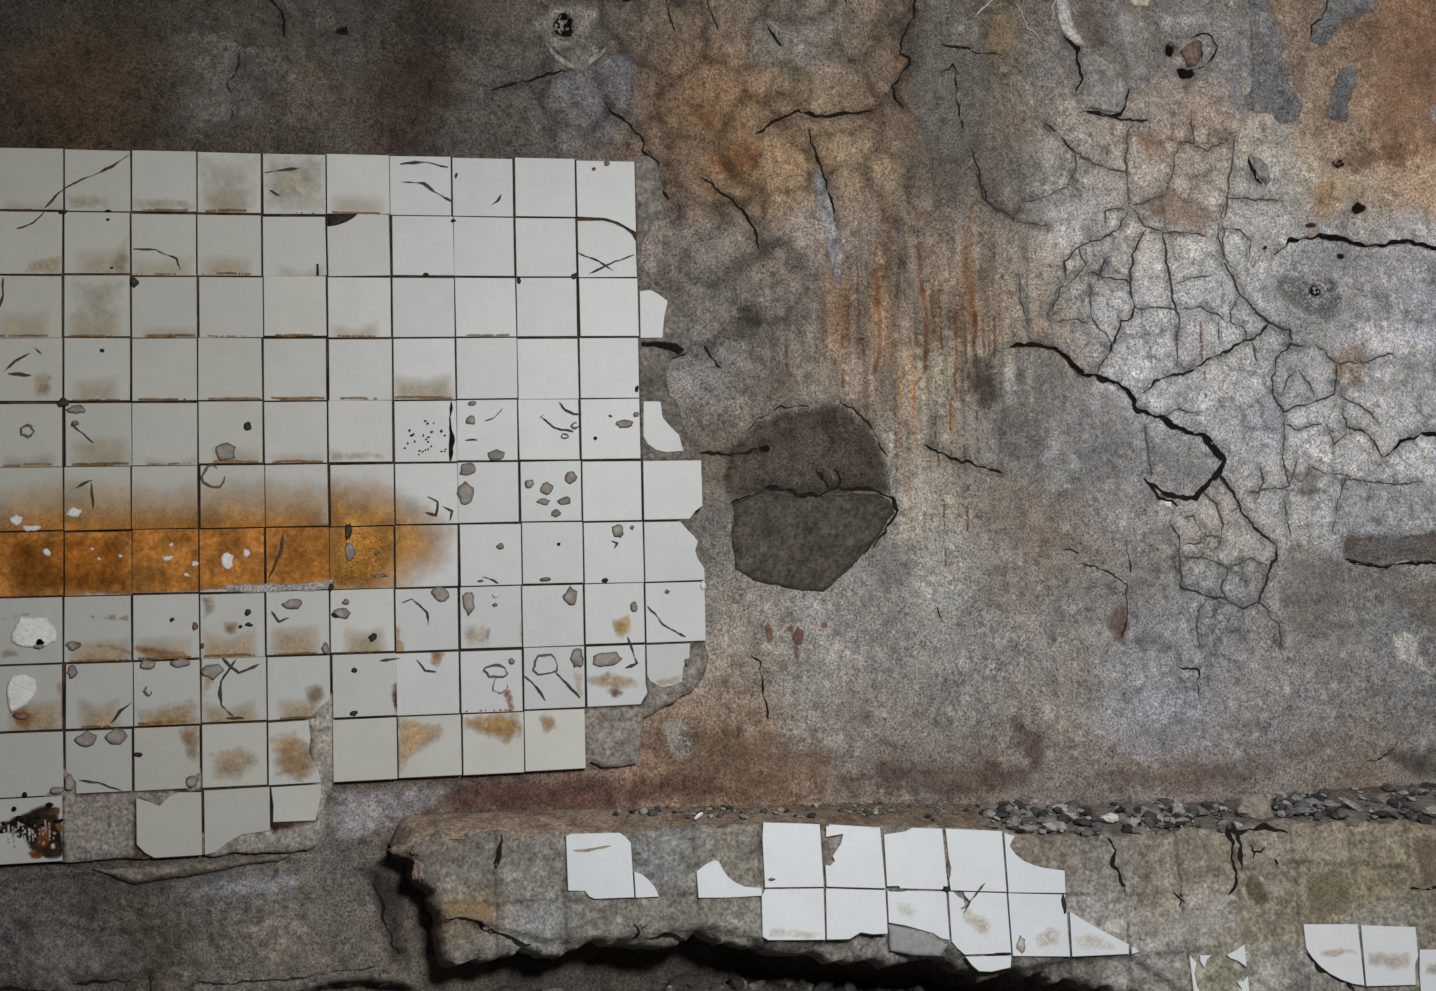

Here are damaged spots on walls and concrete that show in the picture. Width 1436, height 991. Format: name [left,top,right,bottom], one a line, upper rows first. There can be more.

crack [702,177,760,249]
crack [578,252,635,273]
crack [731,0,1436,696]
crack [700,401,889,457]
spalling [726,408,887,494]
rust [0,492,434,605]
crack [626,638,638,668]
peeling [74,728,143,757]
spalling [662,717,695,759]
peeling [0,773,75,849]
crack [445,917,531,947]
peeling [985,935,1025,956]